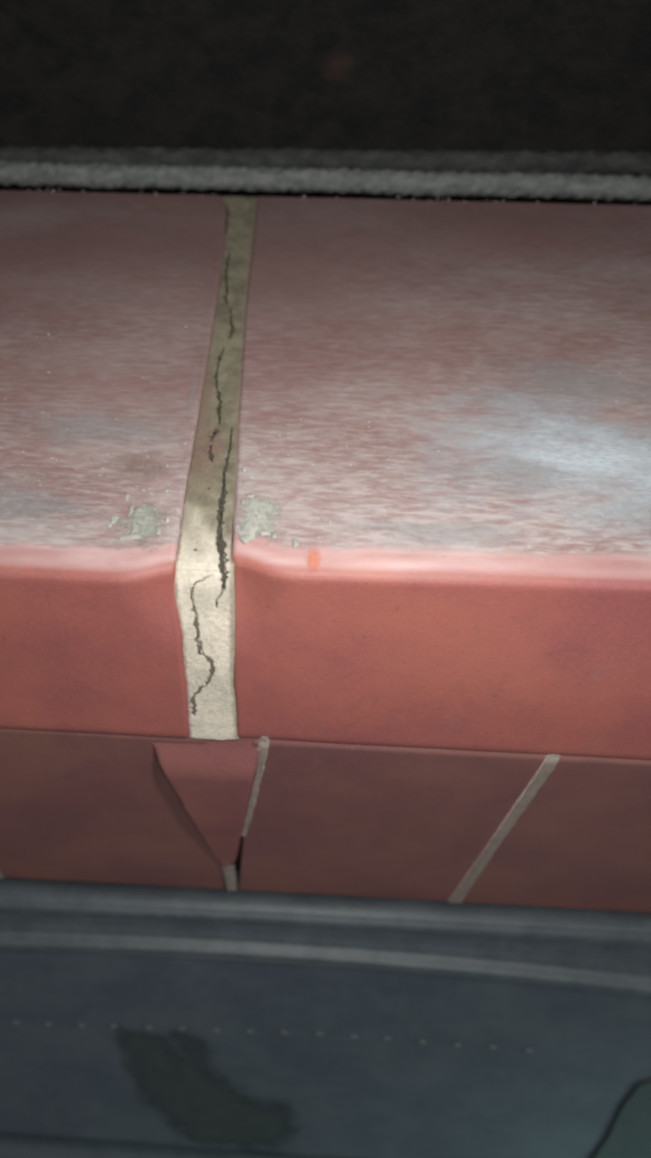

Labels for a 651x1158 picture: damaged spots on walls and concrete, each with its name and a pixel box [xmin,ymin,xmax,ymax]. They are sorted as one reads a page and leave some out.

crack [190,207,234,715]